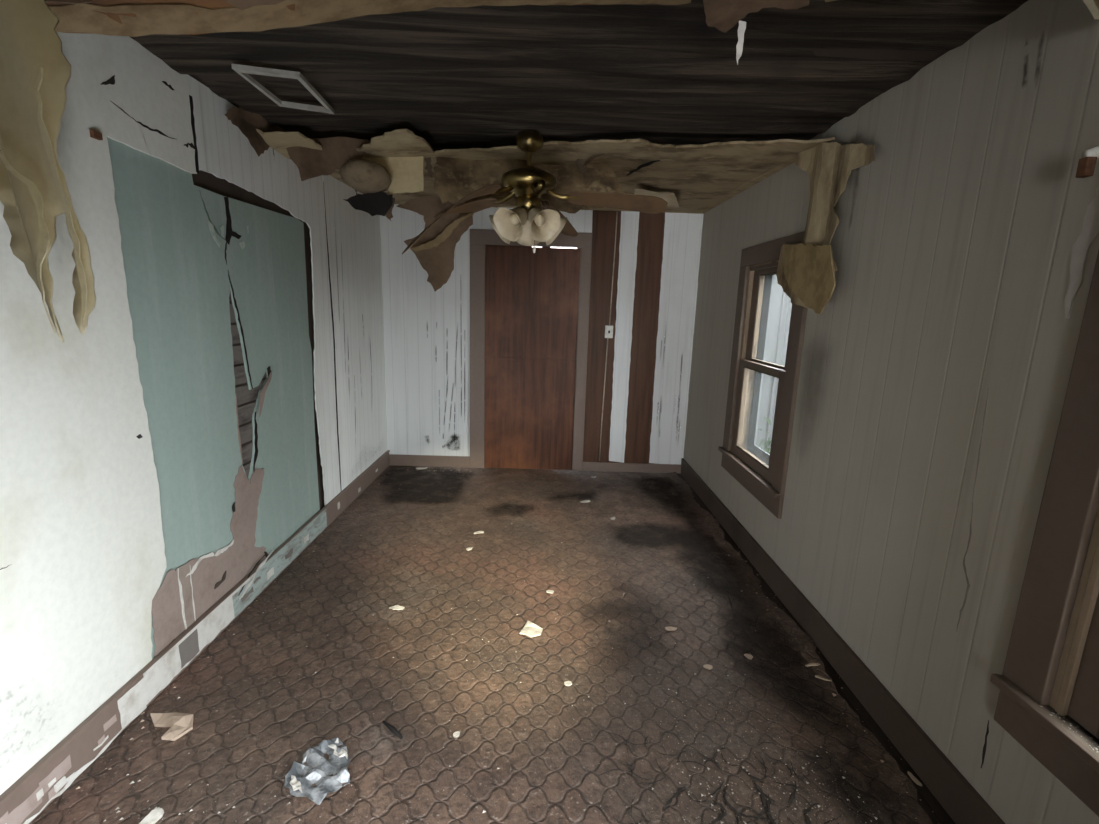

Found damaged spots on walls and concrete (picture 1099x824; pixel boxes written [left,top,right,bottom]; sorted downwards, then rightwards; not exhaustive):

peeling [634,189,680,208]
water stain [382,466,472,503]
water stain [493,504,532,515]
water stain [554,492,594,500]
peeling [0,465,340,824]
water stain [617,478,859,755]
crack [598,732,842,824]
water stain [816,762,881,824]